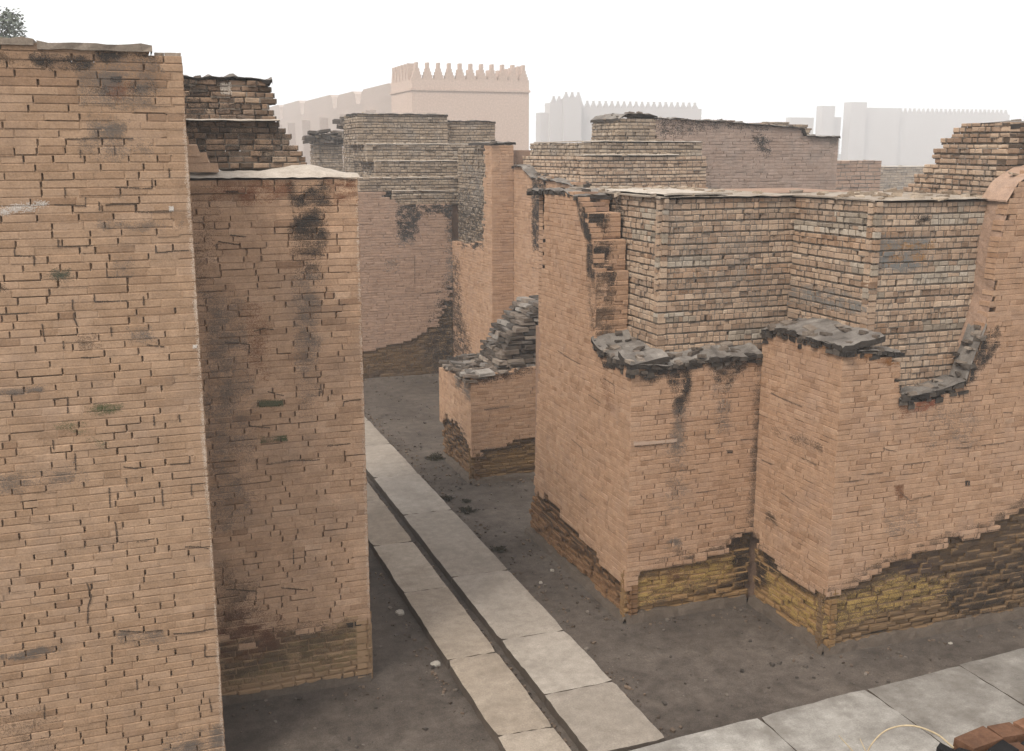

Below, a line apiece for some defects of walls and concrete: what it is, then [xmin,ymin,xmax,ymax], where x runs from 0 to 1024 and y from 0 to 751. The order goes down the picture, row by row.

damp [285,179,355,422]
damp [364,160,484,379]
damp [442,417,535,473]
damp [635,360,1024,639]
damp [966,325,1001,385]
damp [215,559,356,691]